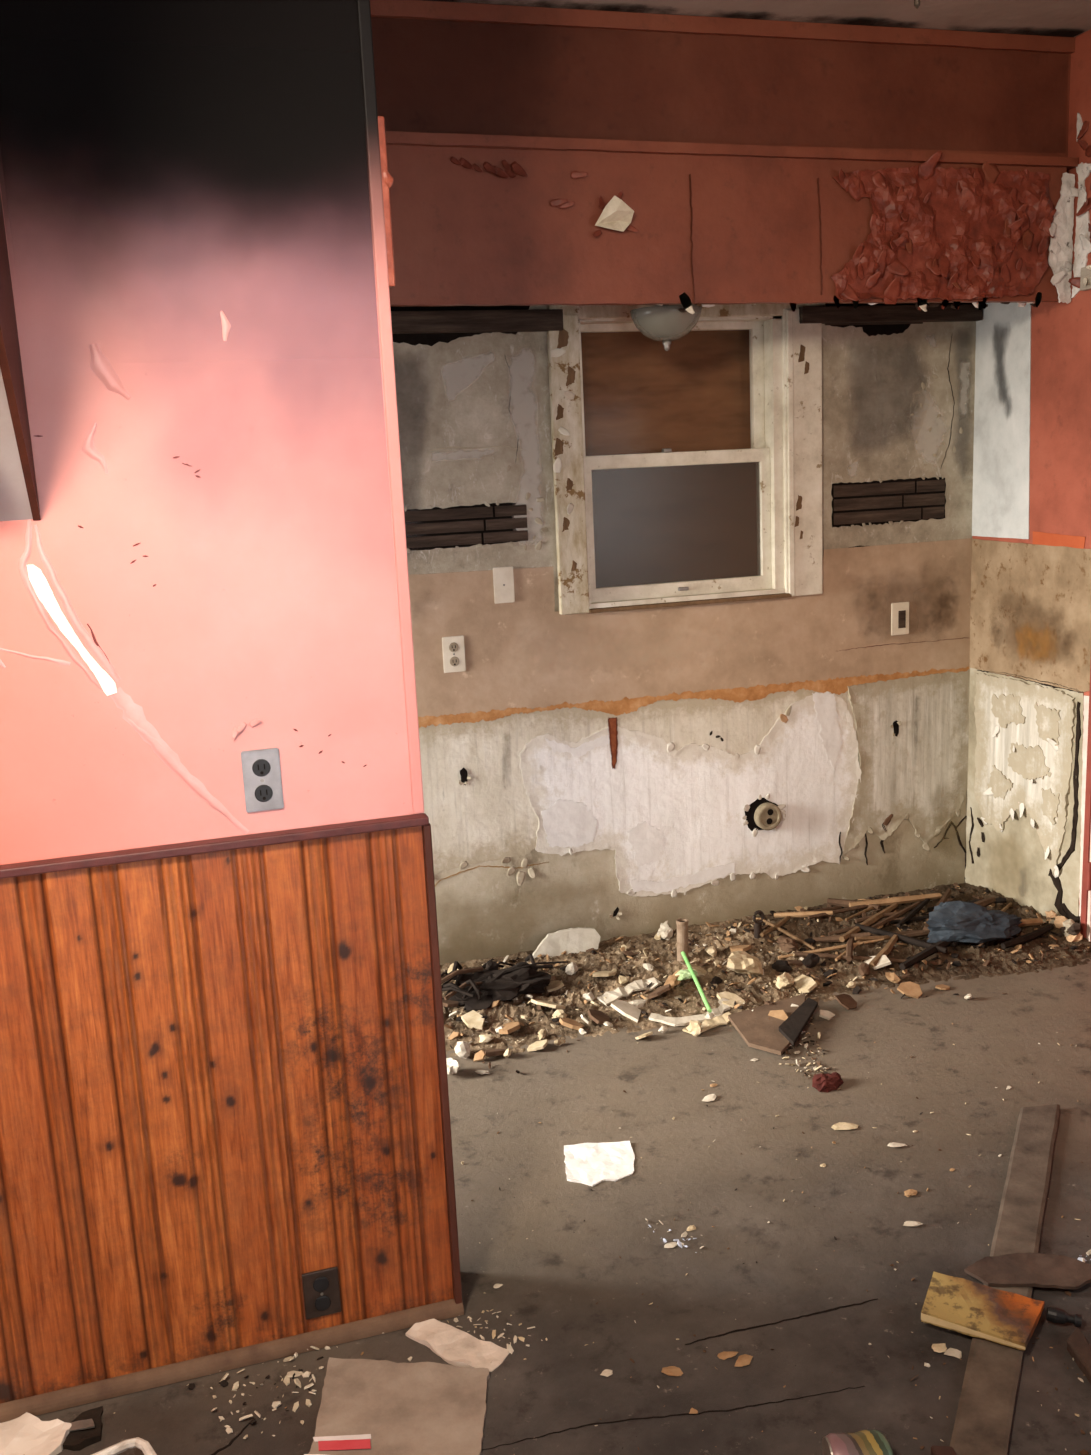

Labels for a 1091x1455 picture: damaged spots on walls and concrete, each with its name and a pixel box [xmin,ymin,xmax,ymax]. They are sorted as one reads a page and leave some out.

flaking render [659,292,715,314]
flaking render [833,296,878,309]
flaking render [915,121,1091,312]
crack [0,520,249,834]
peeling [419,668,1084,942]
crack [977,670,1083,923]